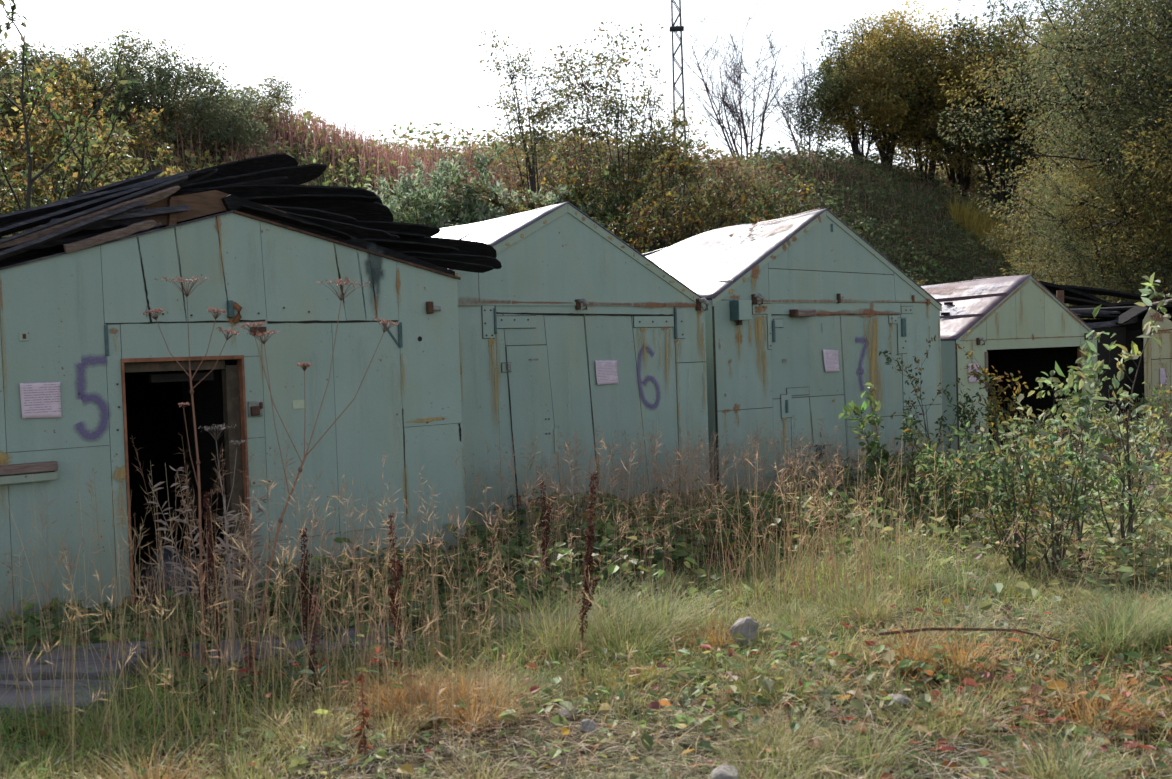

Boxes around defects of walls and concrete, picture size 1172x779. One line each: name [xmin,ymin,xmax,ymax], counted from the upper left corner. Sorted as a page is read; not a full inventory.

corrosion [757,209,821,259]
damp [366,248,383,292]
corrosion [860,301,893,412]